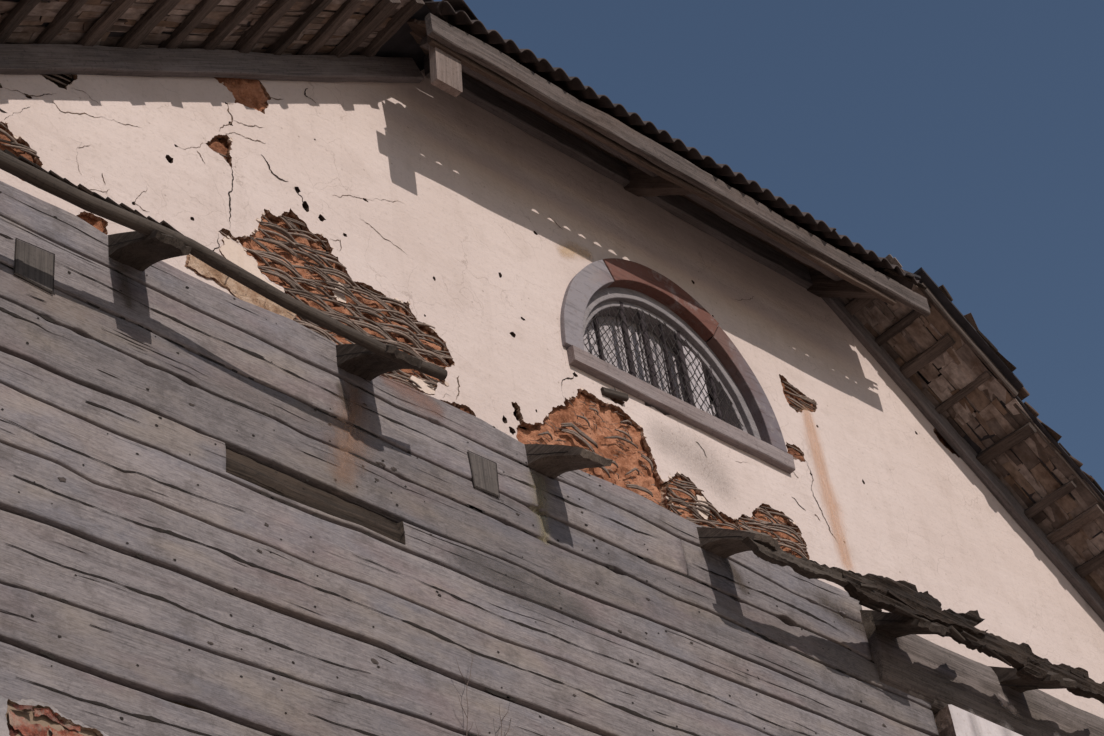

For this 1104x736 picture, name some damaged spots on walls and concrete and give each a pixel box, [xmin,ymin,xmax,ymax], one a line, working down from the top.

spalling [214,77,271,114]
spalling [206,134,233,167]
crack [178,103,304,203]
crack [212,167,234,251]
crack [0,192,468,455]
spalling [185,208,476,417]
spalling [779,374,817,413]
crack [0,416,245,512]
crack [270,403,864,636]
spalling [511,387,810,560]
crack [6,436,836,736]
spalling [6,699,103,736]